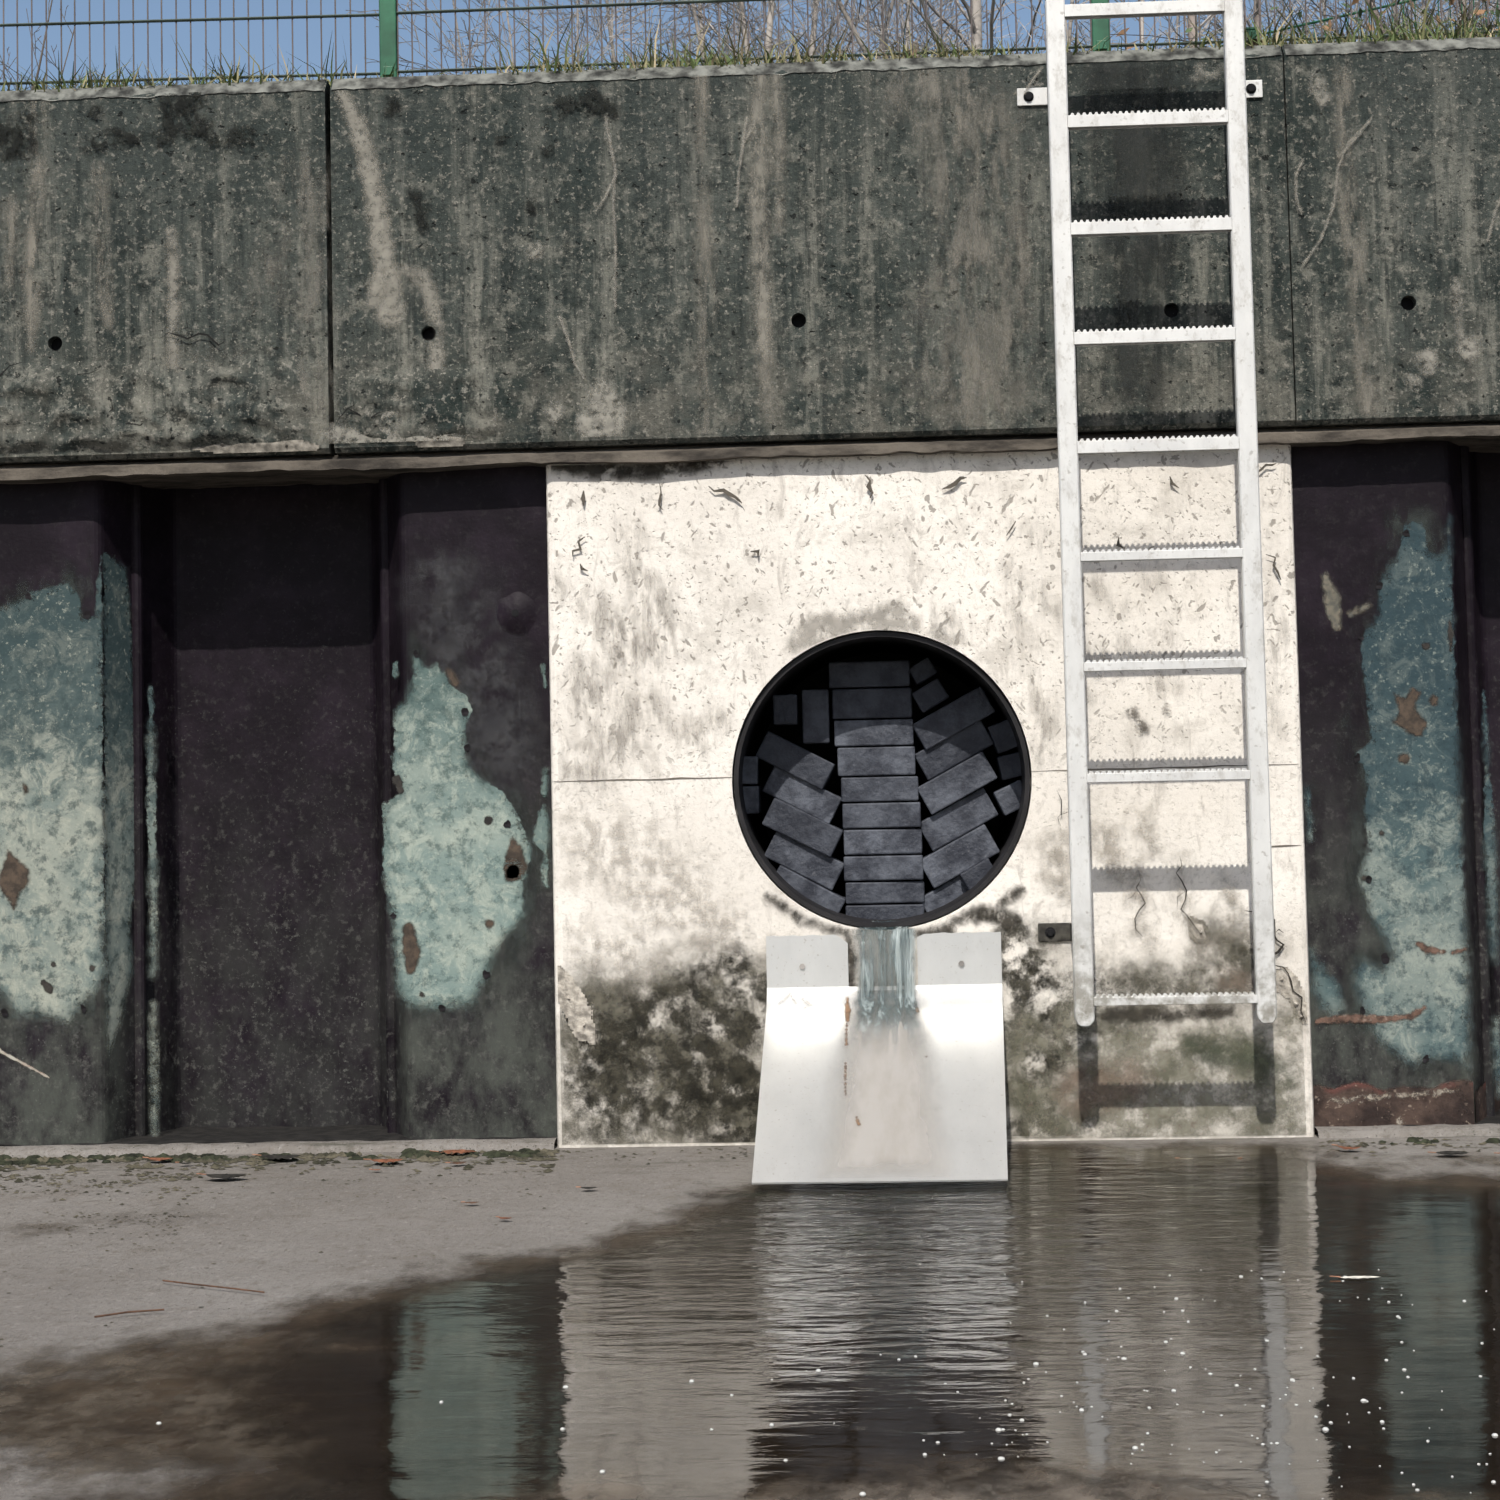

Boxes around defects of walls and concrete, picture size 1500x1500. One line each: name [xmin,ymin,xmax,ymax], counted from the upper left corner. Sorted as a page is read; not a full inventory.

leakage [338,90,444,370]
leakage [1090,60,1179,399]
leakage [328,398,450,443]
peeling [0,553,158,1046]
peeling [382,640,550,1012]
leakage [560,828,767,1144]
leakage [913,924,953,935]
leakage [995,919,1144,1091]
peeling [1276,516,1469,1069]
corrosion [1313,1079,1500,1135]
peeling [1481,692,1498,958]
leakage [0,1103,1500,1500]